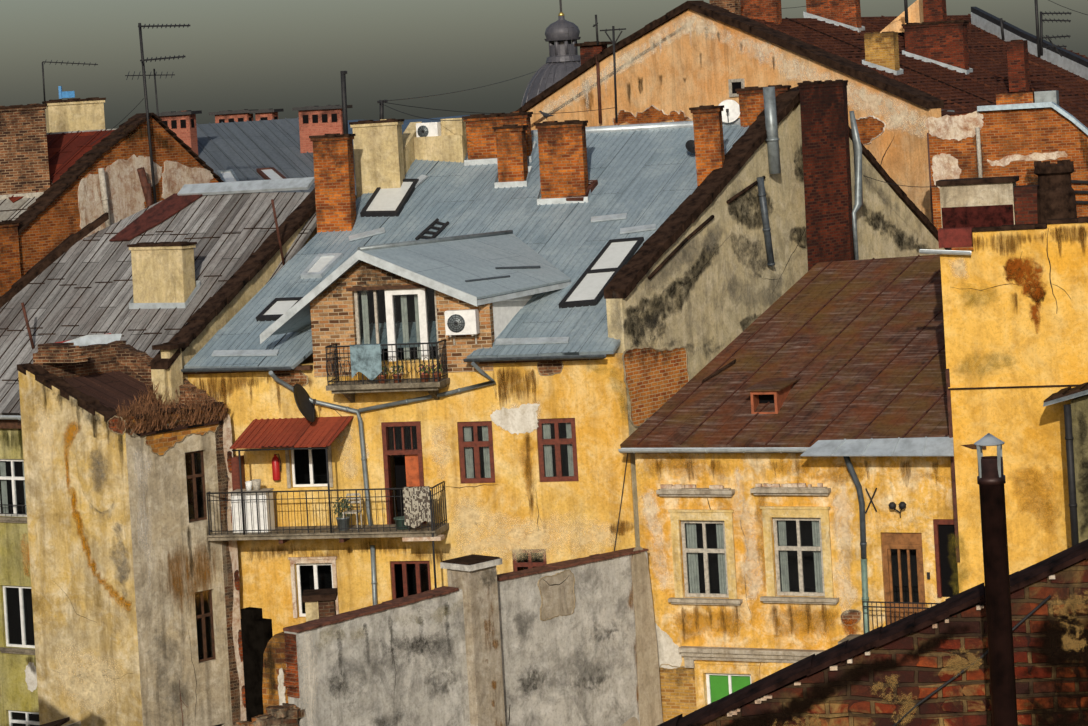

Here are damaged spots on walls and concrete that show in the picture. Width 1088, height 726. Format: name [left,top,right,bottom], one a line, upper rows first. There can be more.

flaking render [856,115,886,146]
peeling [78,154,214,239]
damp [624,234,716,345]
damp [729,189,772,277]
damp [791,227,807,247]
damp [972,227,1087,325]
flaking render [622,346,689,428]
damp [65,415,131,609]
spalling [107,402,247,721]